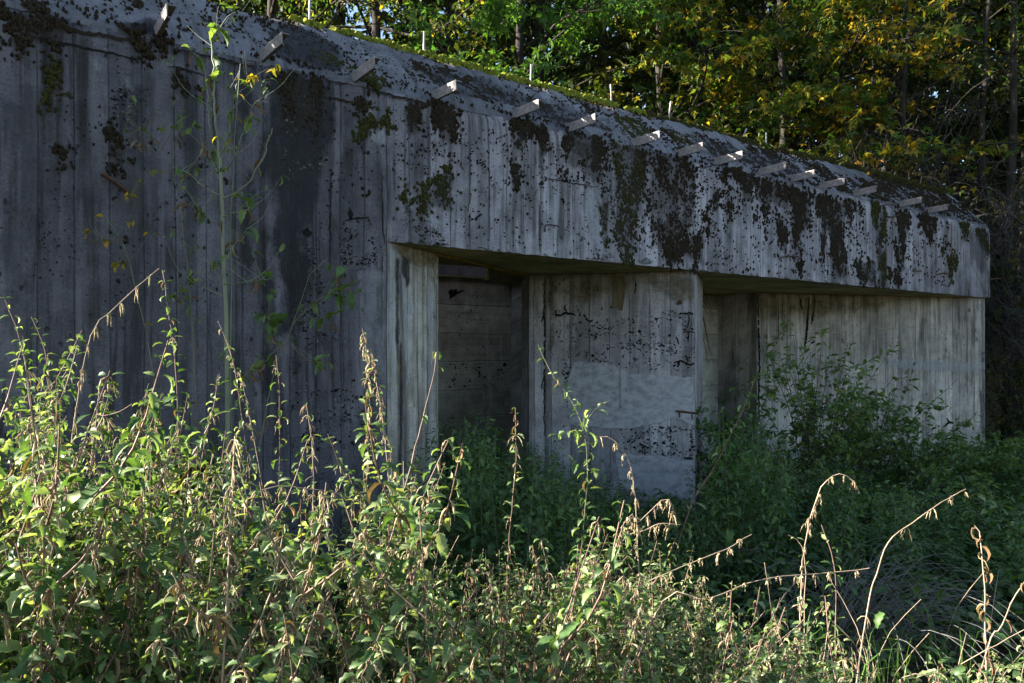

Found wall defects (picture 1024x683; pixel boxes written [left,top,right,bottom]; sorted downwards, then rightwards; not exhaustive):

water stain [240,26,343,365]
water stain [259,341,277,394]